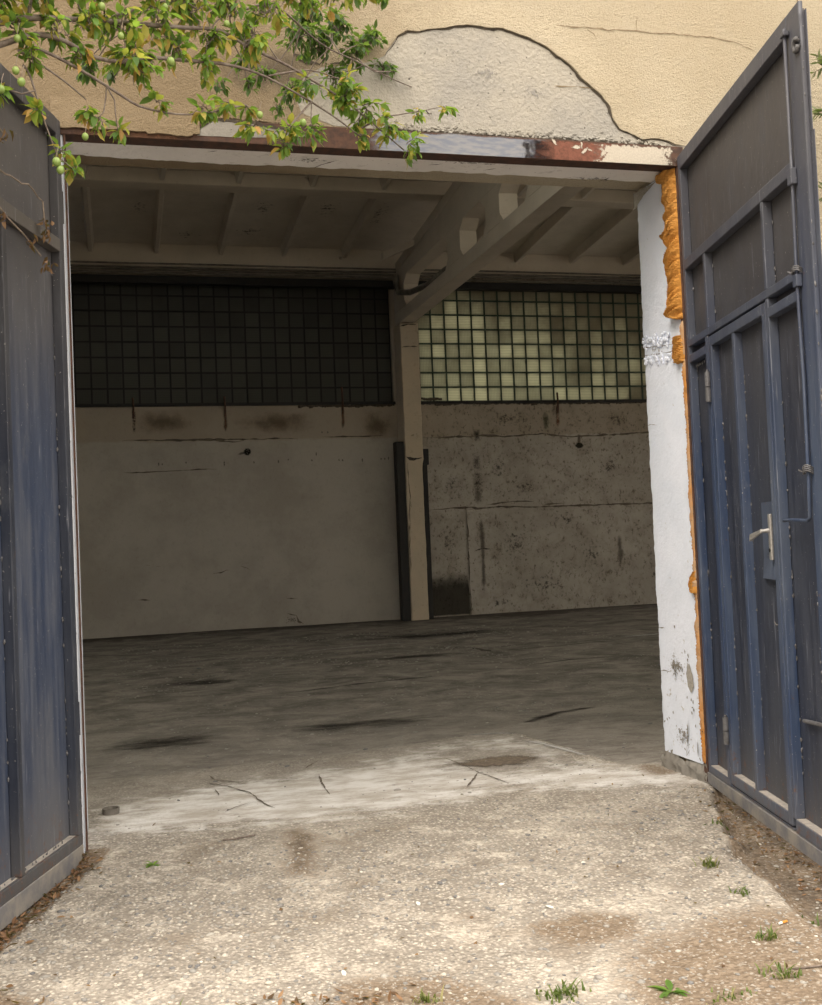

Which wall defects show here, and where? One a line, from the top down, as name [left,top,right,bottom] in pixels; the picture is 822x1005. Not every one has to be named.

flaking render [298,27,685,170]
crack [385,25,685,146]
corrosion [523,140,622,163]
crack [557,20,754,51]
spalling [667,580,706,764]
crack [204,776,272,811]